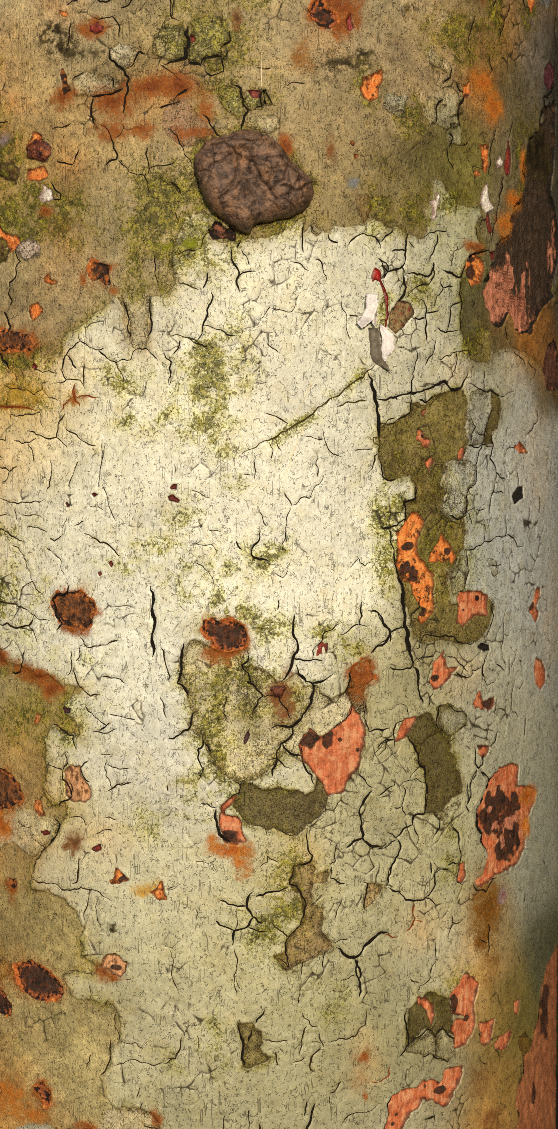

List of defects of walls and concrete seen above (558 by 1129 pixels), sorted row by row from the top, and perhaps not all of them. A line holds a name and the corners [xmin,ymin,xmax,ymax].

corrosion [94,74,212,142]
crack [51,0,305,220]
crack [192,0,558,595]
corrosion [0,768,24,840]
corrosion [49,587,101,636]
corrosion [202,645,248,665]
peeling [180,617,379,845]
crack [63,486,526,1075]
peeling [378,389,501,690]
peeling [395,691,494,825]
crack [304,1011,455,1129]
peeling [385,943,558,1129]